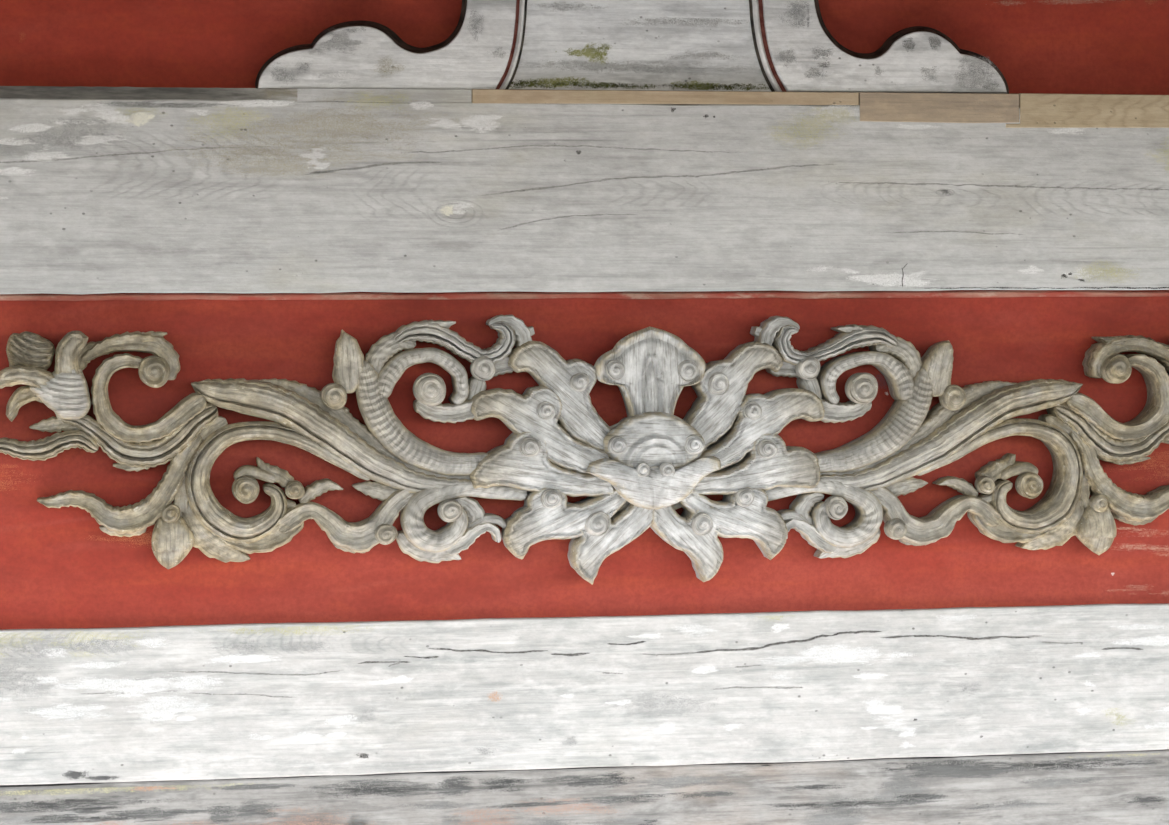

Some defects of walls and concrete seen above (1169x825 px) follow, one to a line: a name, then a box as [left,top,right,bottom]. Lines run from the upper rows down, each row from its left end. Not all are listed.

crack [305,145,1167,196]
crack [498,214,636,231]
crack [894,228,1023,236]
peeling [1110,527,1169,556]
crack [155,630,1142,698]